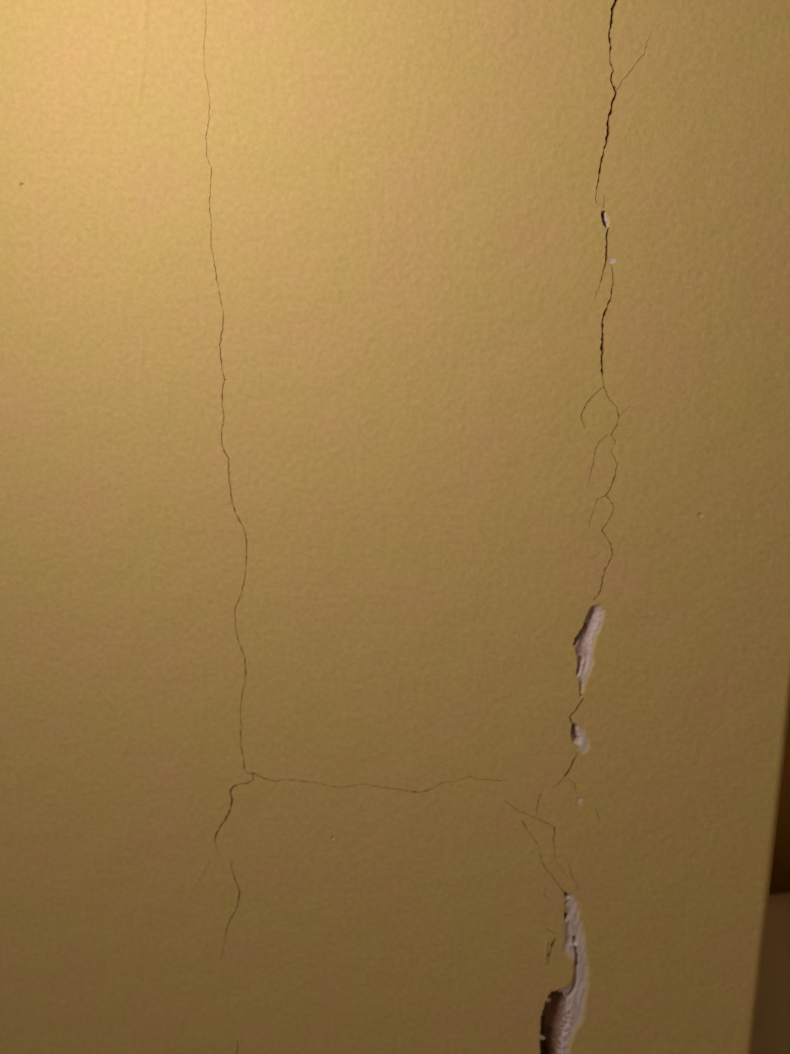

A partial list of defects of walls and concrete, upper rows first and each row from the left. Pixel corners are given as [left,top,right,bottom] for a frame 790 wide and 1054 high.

crack [581,0,652,600]
crack [203,1,600,959]
flaking render [573,604,607,698]
flaking render [570,721,591,756]
flaking render [539,892,591,1054]